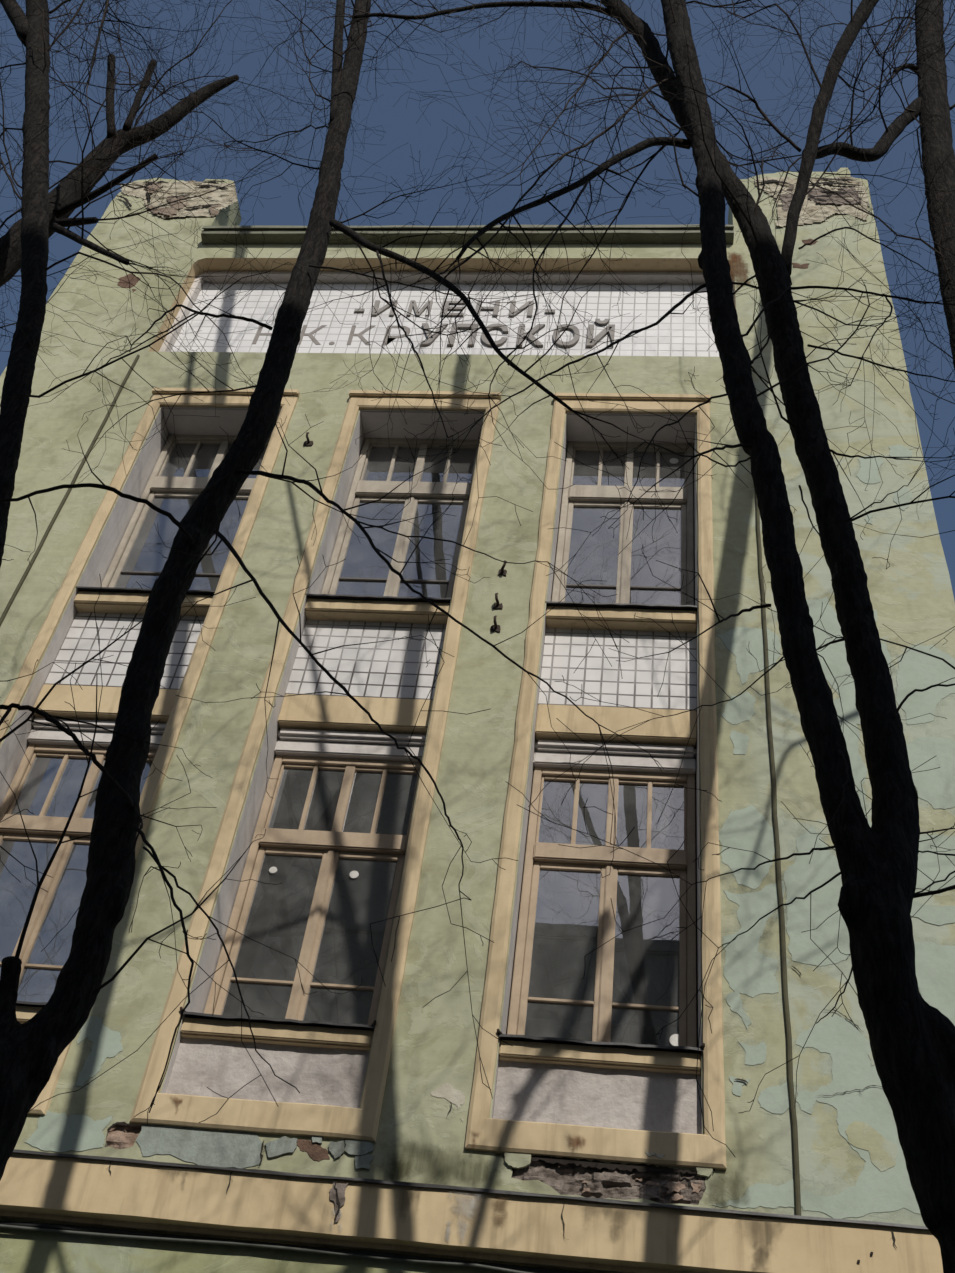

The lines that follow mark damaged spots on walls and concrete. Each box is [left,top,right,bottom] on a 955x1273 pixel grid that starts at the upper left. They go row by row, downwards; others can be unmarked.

spalling [117,180,238,218]
spalling [755,176,869,246]
peeling [856,445,913,484]
peeling [716,627,781,755]
peeling [806,596,872,827]
peeling [881,644,955,810]
peeling [719,805,850,1029]
peeling [910,835,955,926]
peeling [914,942,955,1026]
peeling [25,1111,374,1170]
peeling [496,1015,921,1219]
spalling [330,1180,349,1222]